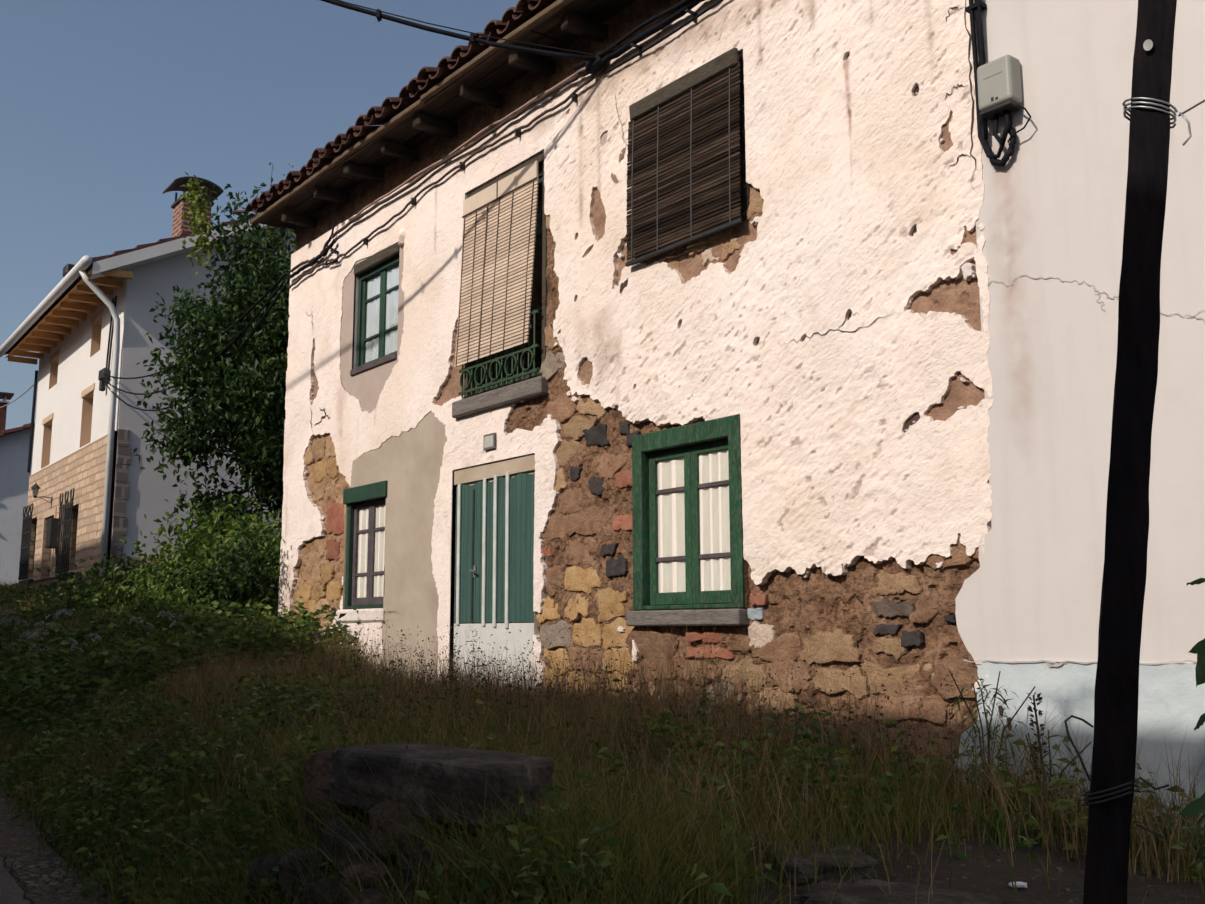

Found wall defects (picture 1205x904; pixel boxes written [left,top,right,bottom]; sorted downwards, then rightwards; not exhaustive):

peeling [939,112,953,152]
peeling [588,187,606,253]
peeling [614,184,764,293]
peeling [436,299,465,406]
crack [778,311,898,346]
crack [986,275,1119,312]
crack [1160,310,1205,323]
peeling [292,433,351,630]
flaking render [506,215,1097,789]